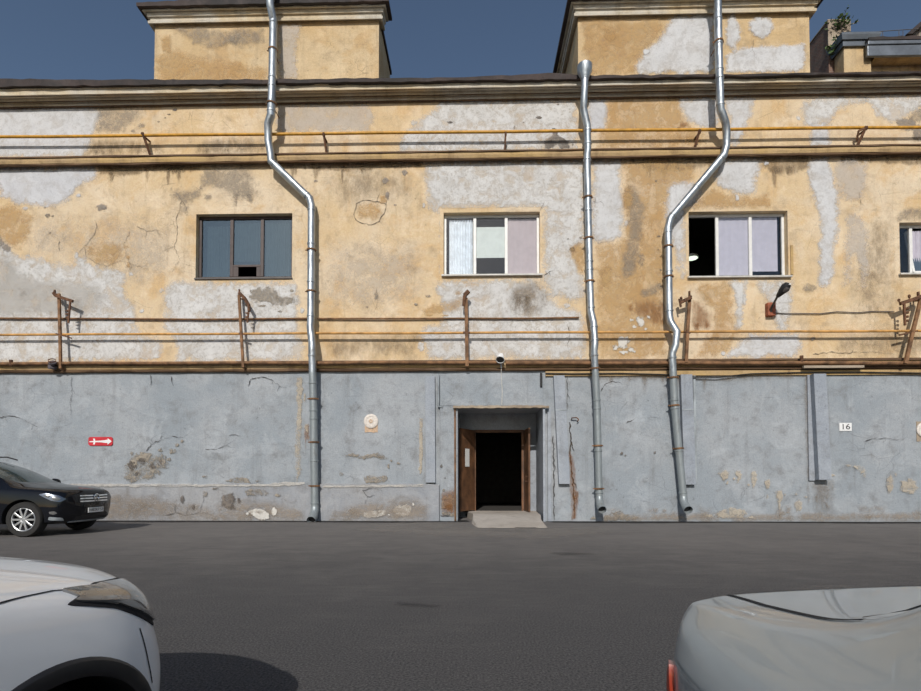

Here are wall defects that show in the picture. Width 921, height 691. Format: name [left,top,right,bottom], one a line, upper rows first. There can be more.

peeling [726,14,741,51]
crack [58,195,187,274]
crack [353,191,387,225]
flaking render [70,377,308,521]